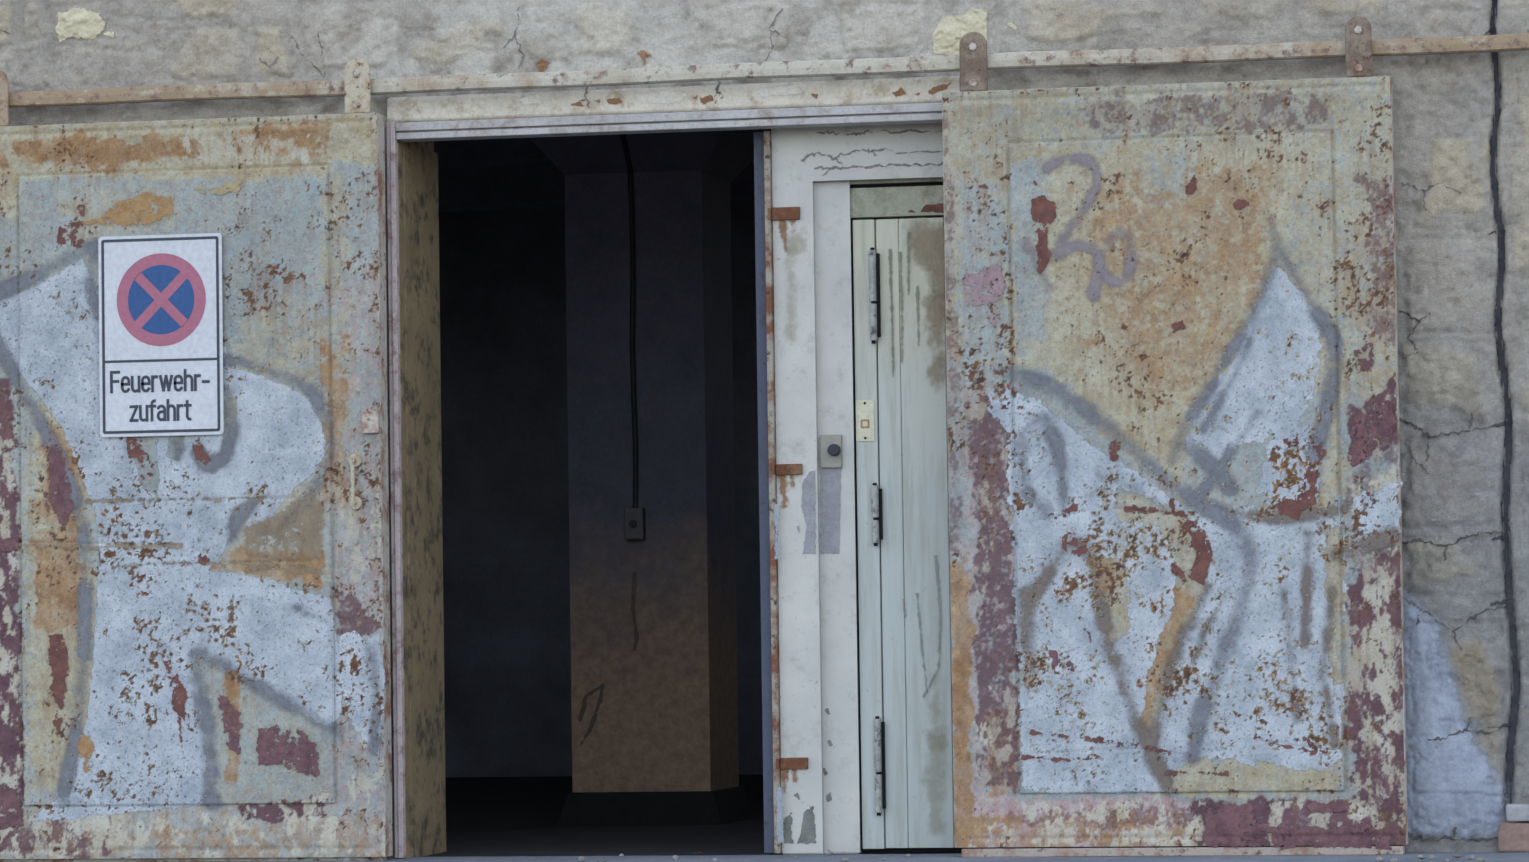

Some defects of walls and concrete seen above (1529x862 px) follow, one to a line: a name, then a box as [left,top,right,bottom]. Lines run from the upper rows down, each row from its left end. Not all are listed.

crack [801,129,943,175]
water stain [889,232,920,375]
crack [1399,0,1520,842]
peeling [44,444,74,528]
corrosion [85,436,267,503]
corrosion [764,131,797,854]
corrosion [1277,436,1327,522]
corrosion [1124,498,1213,585]
peeling [48,634,69,735]
corrosion [162,659,189,743]
peeling [0,783,24,829]
peeling [1201,801,1392,850]